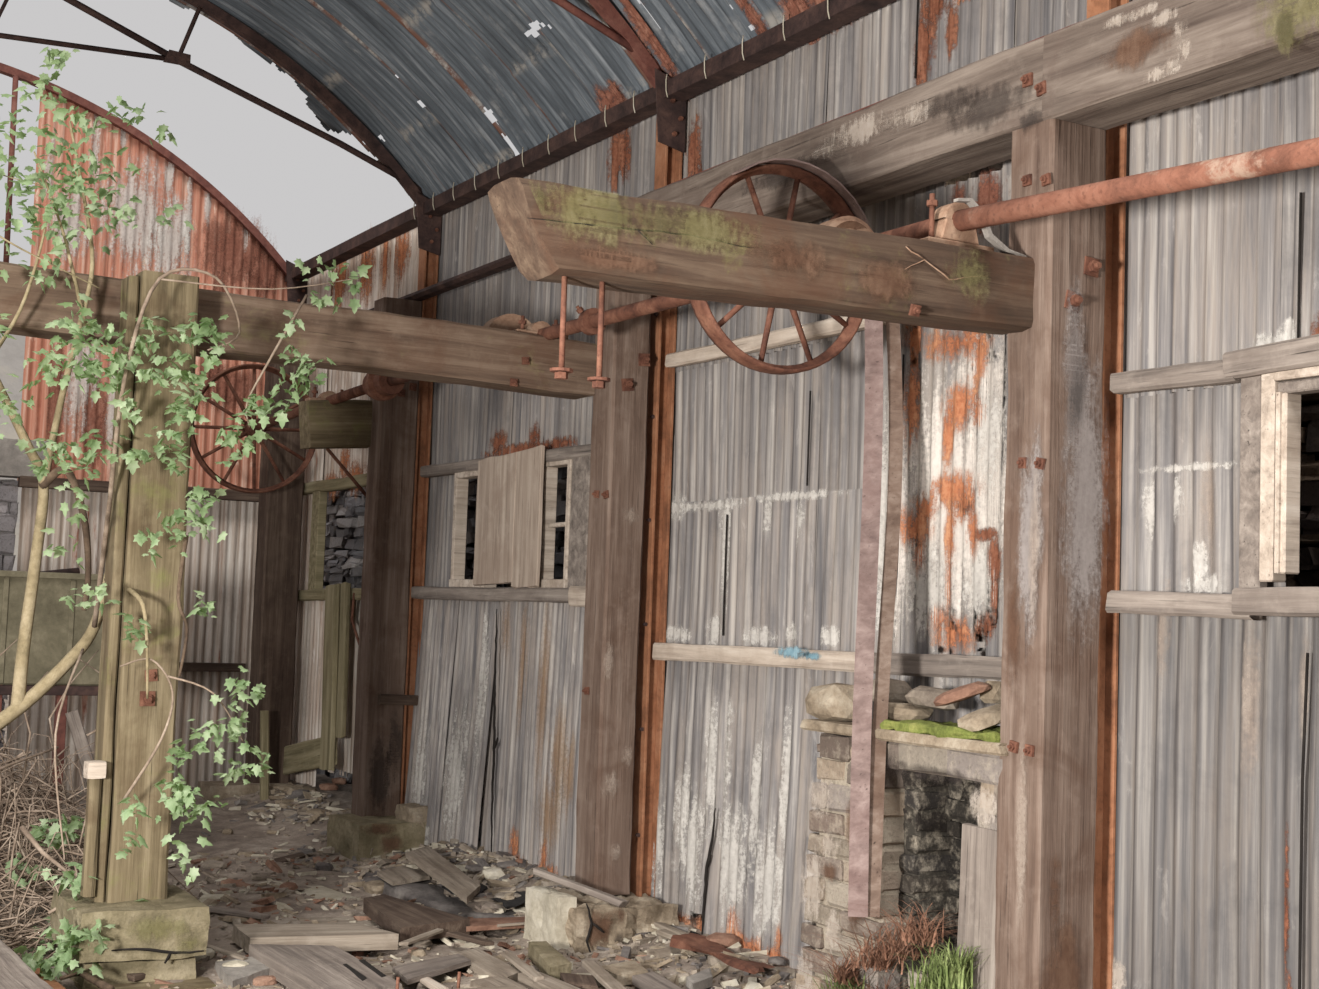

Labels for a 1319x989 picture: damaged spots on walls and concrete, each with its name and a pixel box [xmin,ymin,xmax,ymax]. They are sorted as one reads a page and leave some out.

rust [619,0,680,78]
rust [734,0,766,35]
rust [779,0,825,21]
rust [914,0,964,85]
rust [595,80,628,112]
rust [606,128,631,193]
rust [687,100,702,177]
rust [953,168,1002,206]
rust [198,211,283,298]
rust [484,424,577,458]
rust [900,326,1001,656]
leakage [671,490,828,594]